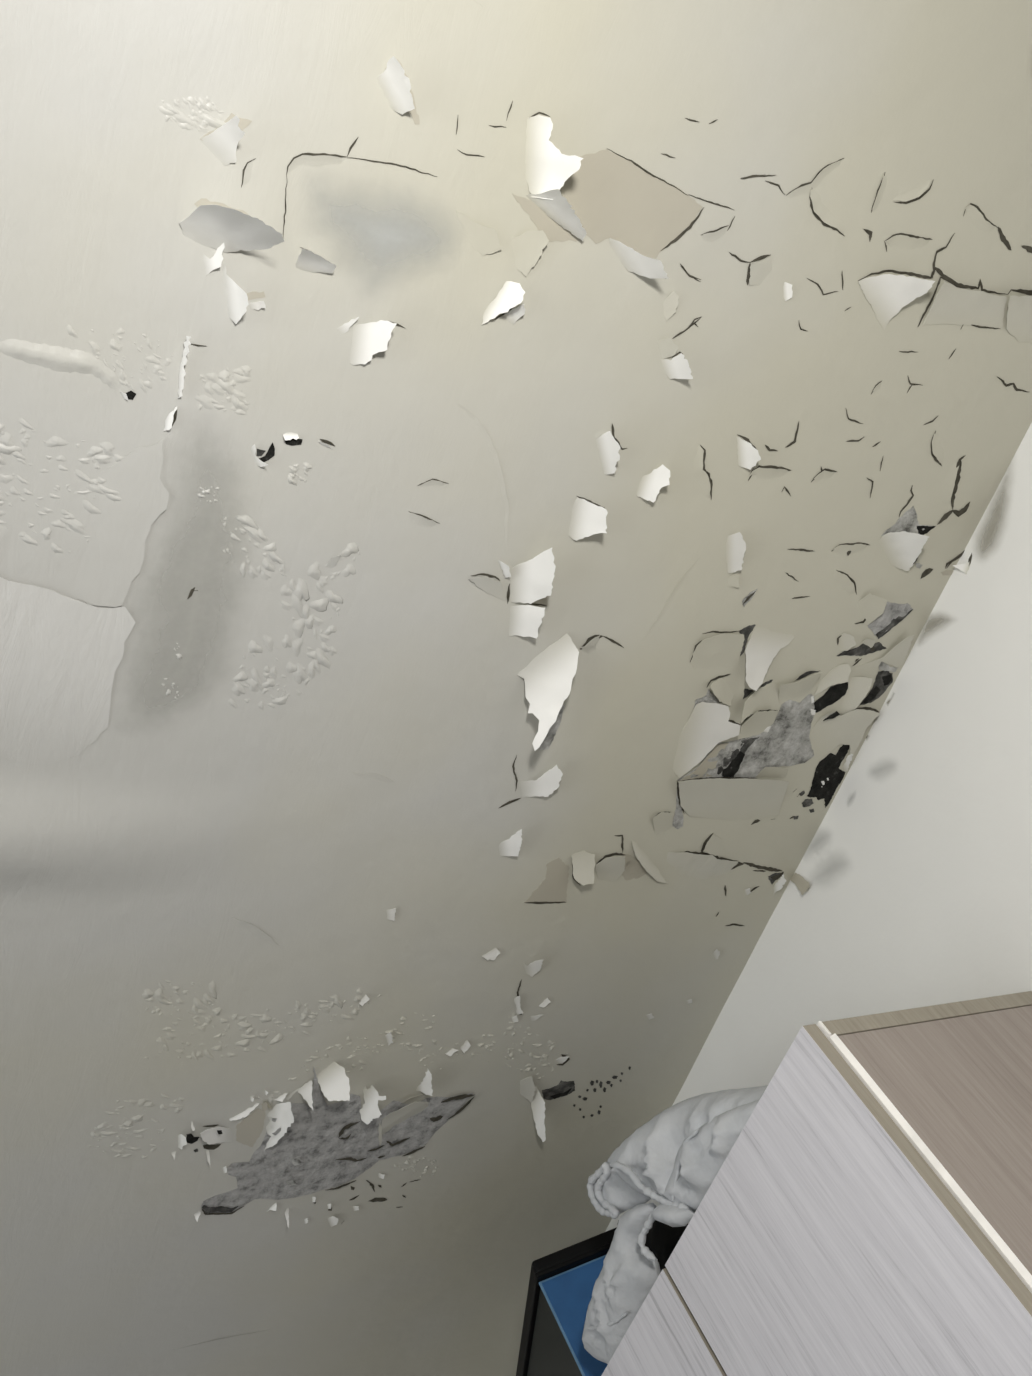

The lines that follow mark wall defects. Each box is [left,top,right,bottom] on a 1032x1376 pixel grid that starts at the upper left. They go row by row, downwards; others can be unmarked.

crack [241,138,437,236]
crack [456,101,513,157]
peeling [456,112,733,379]
crack [700,217,851,331]
crack [743,158,1032,288]
peeling [337,317,406,365]
peeling [568,496,608,541]
crack [782,351,921,498]
crack [924,416,970,525]
peeling [509,548,579,750]
spalling [653,593,914,835]
spalling [171,1062,475,1228]